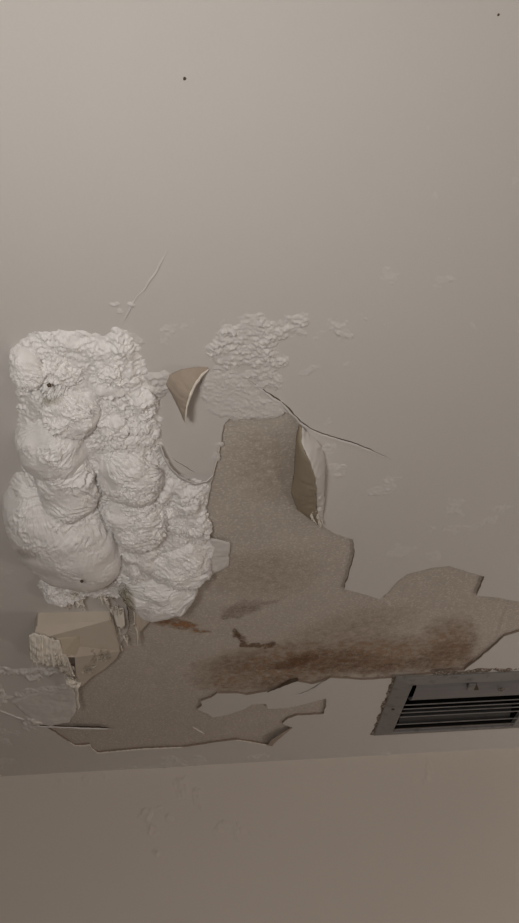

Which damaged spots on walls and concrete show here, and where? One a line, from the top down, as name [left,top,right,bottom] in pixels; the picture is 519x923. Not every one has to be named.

crack [247,379,391,460]
peeling [52,412,519,751]
damp [215,630,468,688]